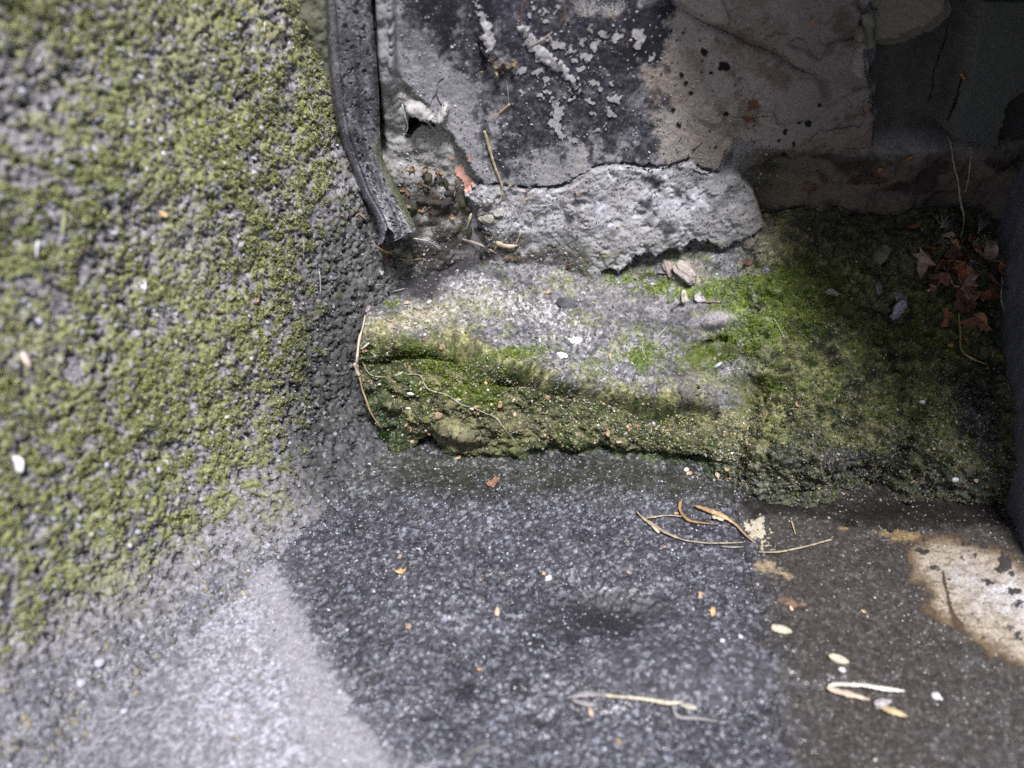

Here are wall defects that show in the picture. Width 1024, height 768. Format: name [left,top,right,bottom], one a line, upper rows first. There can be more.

peeling [475,0,497,52]
peeling [512,5,656,177]
peeling [405,98,449,138]
damp [403,0,712,238]
spalling [450,153,474,193]
crack [473,143,726,193]
damp [391,257,493,299]
damp [960,384,998,461]